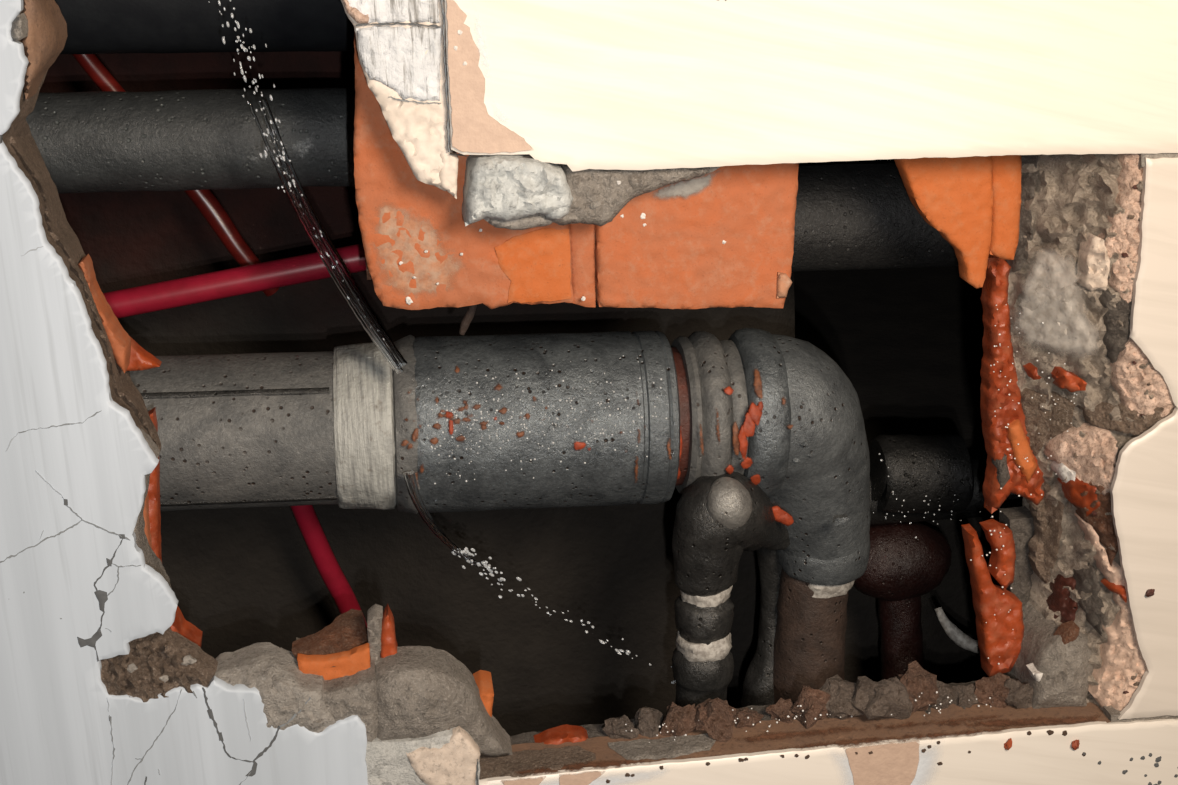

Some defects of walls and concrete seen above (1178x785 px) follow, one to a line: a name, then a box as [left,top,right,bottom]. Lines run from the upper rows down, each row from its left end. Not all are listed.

peeling [341,0,532,199]
spalling [2,0,172,589]
crack [6,411,101,451]
spalling [365,154,1178,785]
crack [0,470,141,661]
crack [107,688,311,785]
spalling [101,627,336,733]